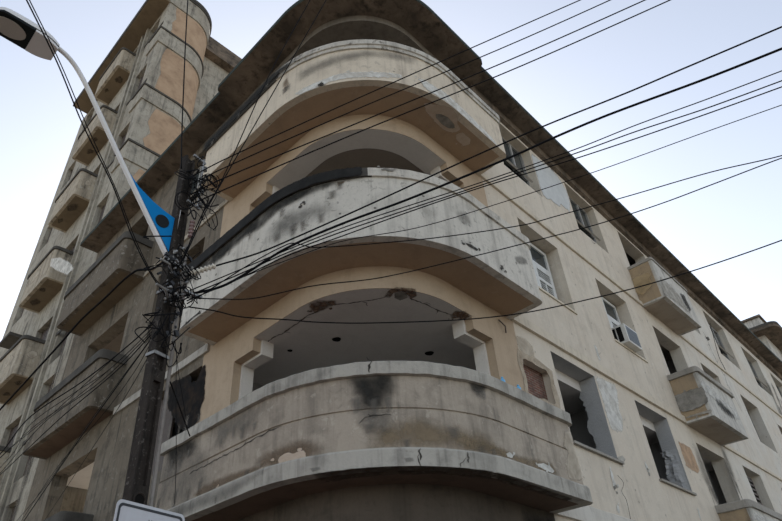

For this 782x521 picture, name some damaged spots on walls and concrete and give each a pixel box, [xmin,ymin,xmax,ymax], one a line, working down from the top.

flaking render [385,288,416,300]
flaking render [307,301,335,312]
flaking render [451,311,470,321]
crack [268,311,318,342]
leakage [352,375,393,409]
flaking render [579,376,623,458]
flaking render [271,448,306,463]